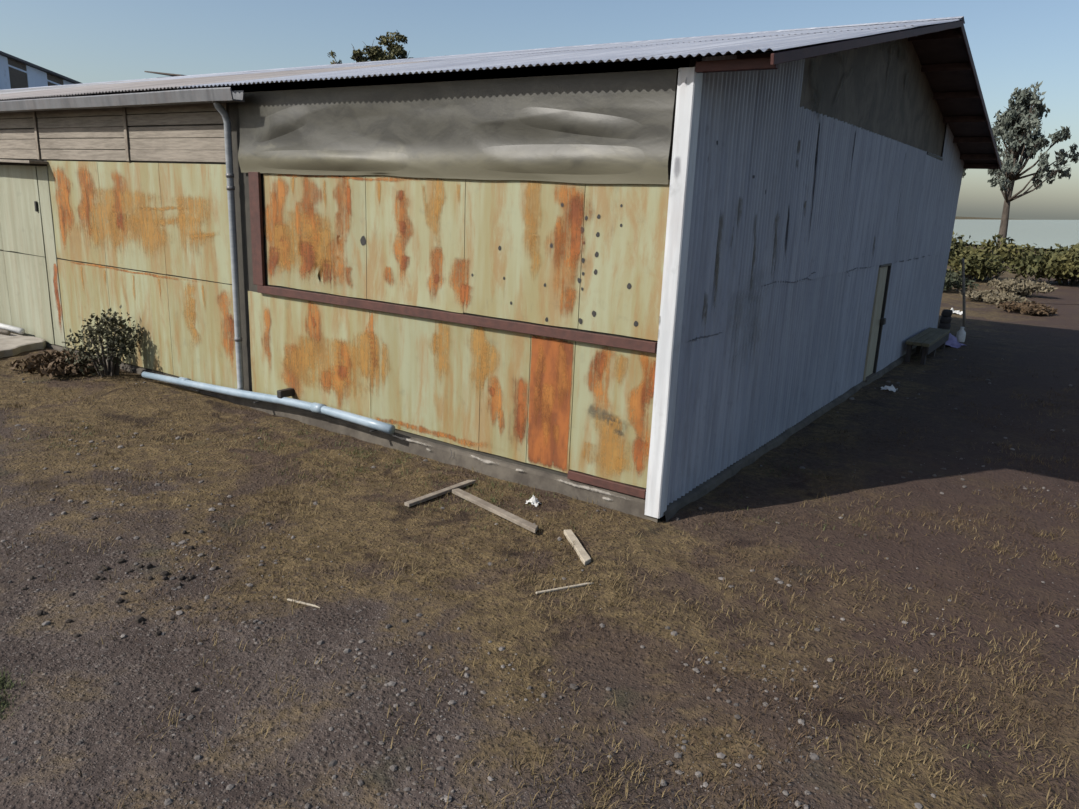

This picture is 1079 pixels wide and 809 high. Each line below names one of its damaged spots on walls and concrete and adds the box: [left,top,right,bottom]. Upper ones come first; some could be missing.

corrosion [53,263,62,324]
corrosion [72,262,175,296]
corrosion [218,292,234,355]
corrosion [423,178,470,305]
corrosion [525,181,541,270]
corrosion [550,187,591,313]
corrosion [377,418,481,447]
corrosion [473,327,573,471]
corrosion [584,348,656,472]